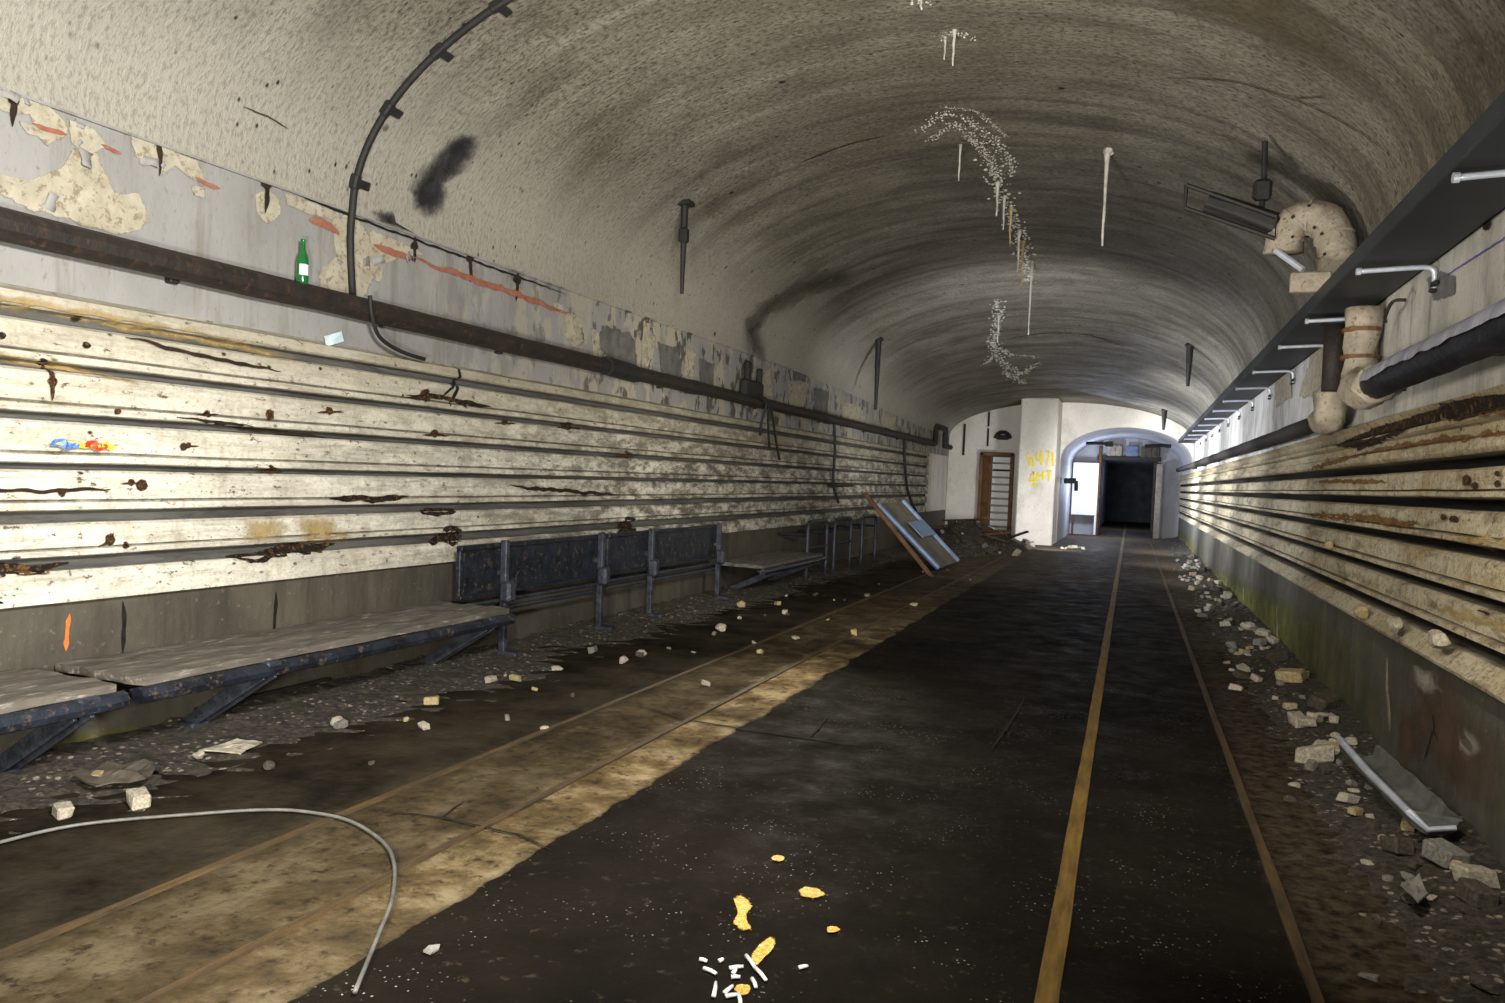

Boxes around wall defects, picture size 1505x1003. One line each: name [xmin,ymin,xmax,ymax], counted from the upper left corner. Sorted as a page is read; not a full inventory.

peeling [0,90,149,235]
peeling [131,136,205,198]
leakage [914,105,1037,335]
peeling [554,302,715,385]
leakage [980,299,1041,384]
corrosion [1312,409,1505,484]
corrosion [1311,511,1417,528]